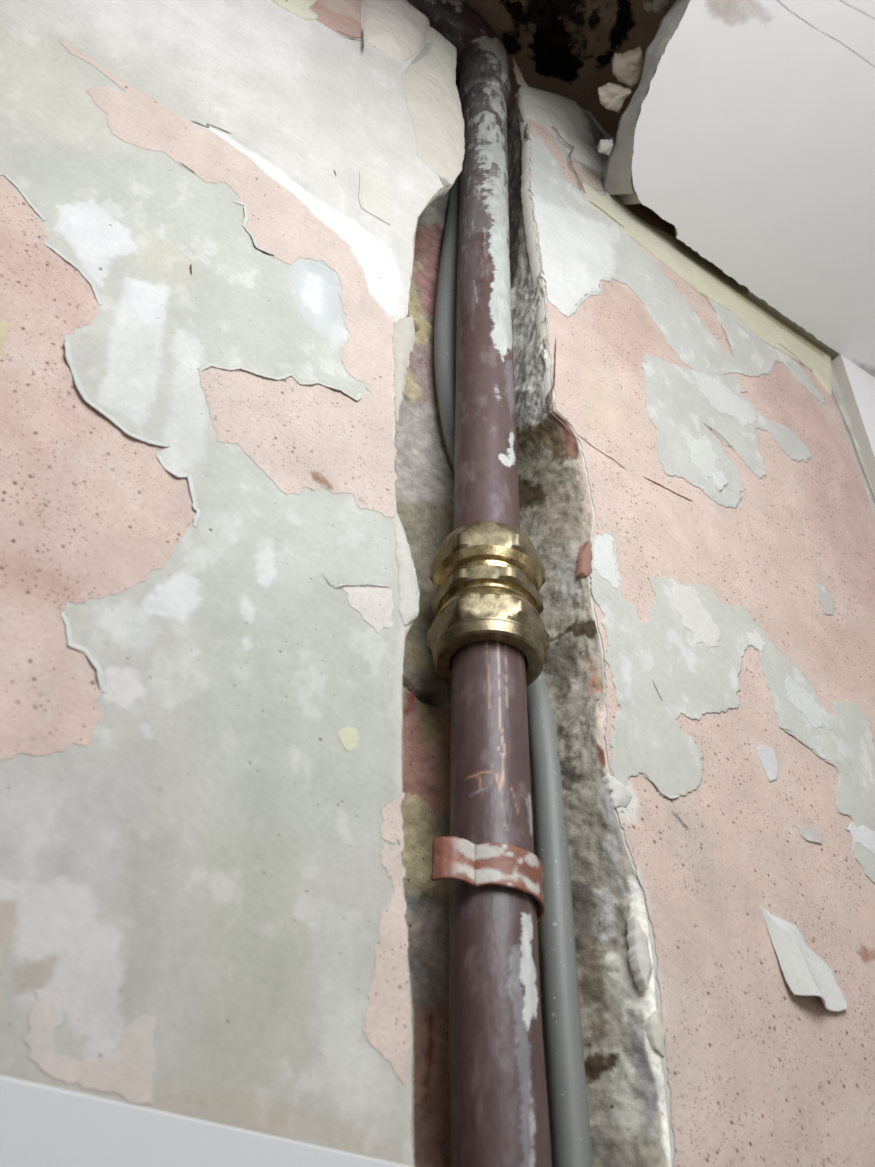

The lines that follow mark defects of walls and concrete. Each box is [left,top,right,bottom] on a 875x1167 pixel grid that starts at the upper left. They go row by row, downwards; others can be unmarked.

flaking render [309,0,362,39]
peeling [513,58,528,86]
mould [501,0,635,83]
crack [777,0,875,67]
peeling [529,118,583,192]
peeling [58,36,419,633]
peeling [636,242,734,357]
peeling [0,172,201,760]
peeling [545,279,875,745]
peeling [363,792,411,1084]
peeling [594,601,875,1167]